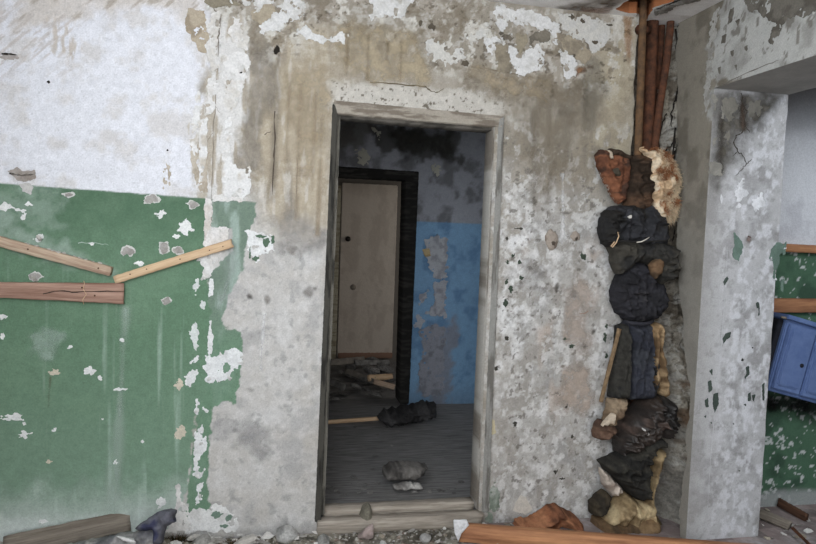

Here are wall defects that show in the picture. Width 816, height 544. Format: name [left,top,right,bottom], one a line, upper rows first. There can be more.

peeling [369,0,414,21]
peeling [419,2,613,79]
spalling [628,0,701,16]
peeling [159,0,349,310]
crack [659,88,678,169]
crack [720,60,778,175]
flaking render [0,167,36,220]
peeling [144,163,171,219]
peeling [121,245,144,266]
peeling [174,320,244,391]
peeling [0,413,33,439]
peeling [156,424,239,534]